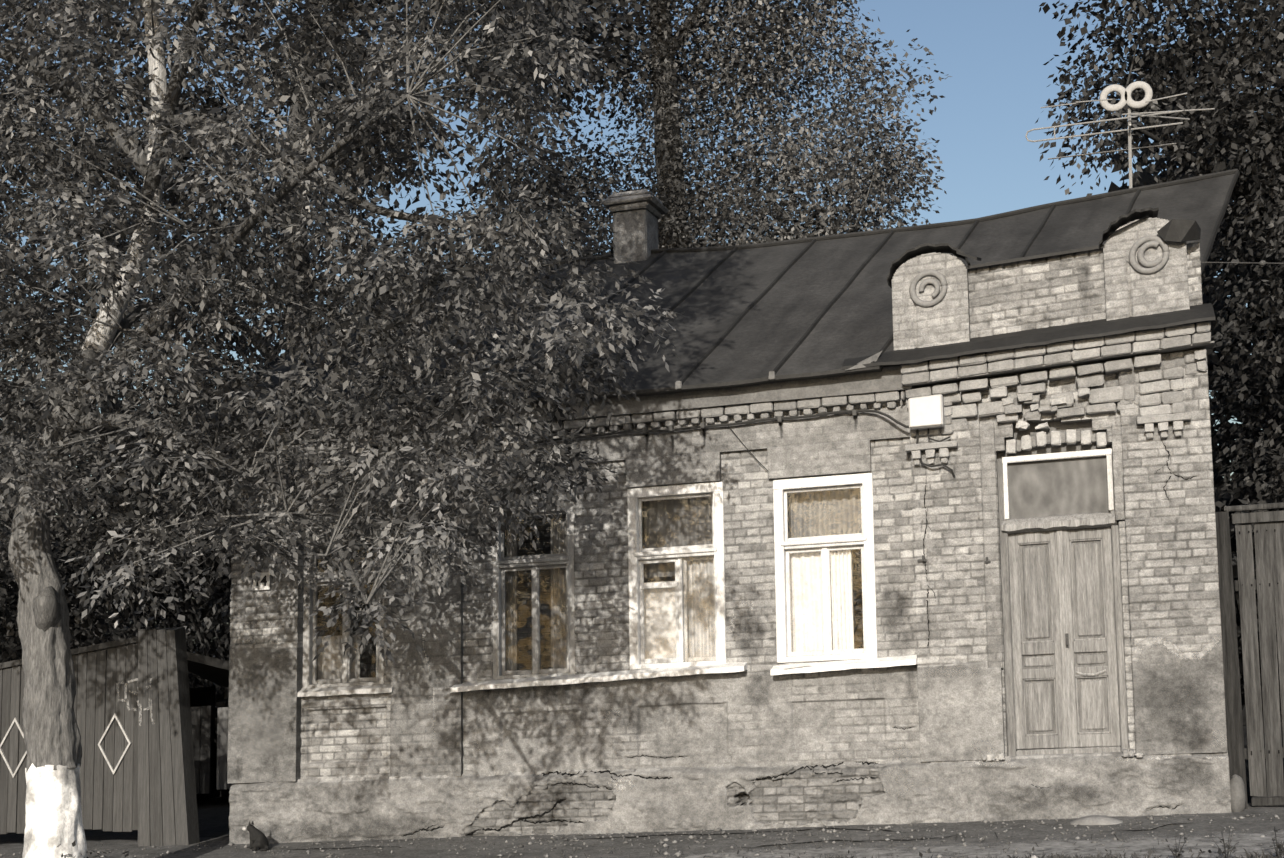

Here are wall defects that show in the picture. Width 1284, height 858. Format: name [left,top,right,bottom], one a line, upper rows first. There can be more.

crack [1156,443,1197,500]
spalling [463,776,616,836]
spalling [726,763,888,827]